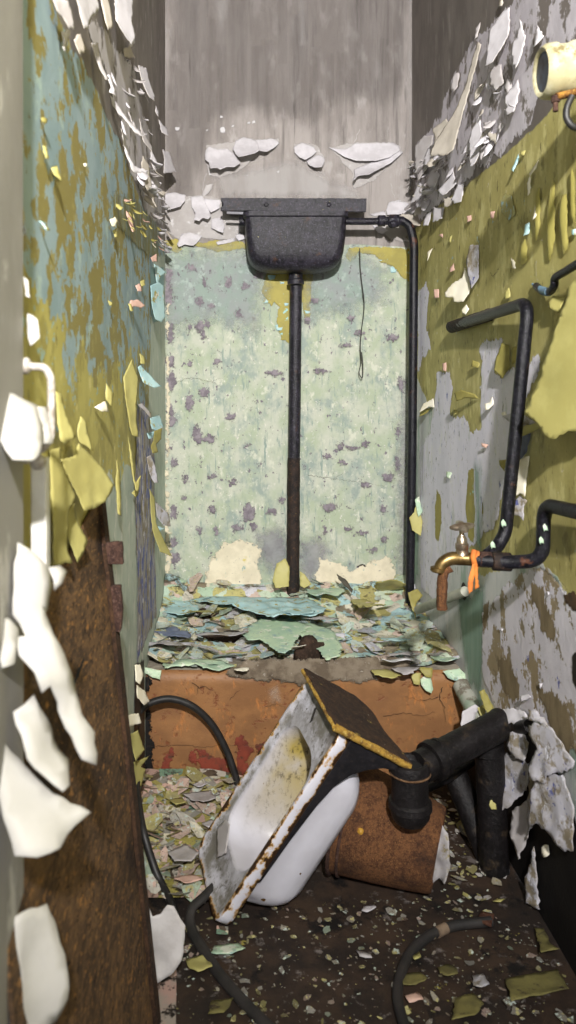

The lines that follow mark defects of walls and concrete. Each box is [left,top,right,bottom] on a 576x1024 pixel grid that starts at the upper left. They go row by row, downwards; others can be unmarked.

peeling [294,0,576,282]
peeling [0,0,286,858]
peeling [301,337,517,599]
peeling [417,245,479,370]
peeling [514,278,576,521]
peeling [482,567,576,910]